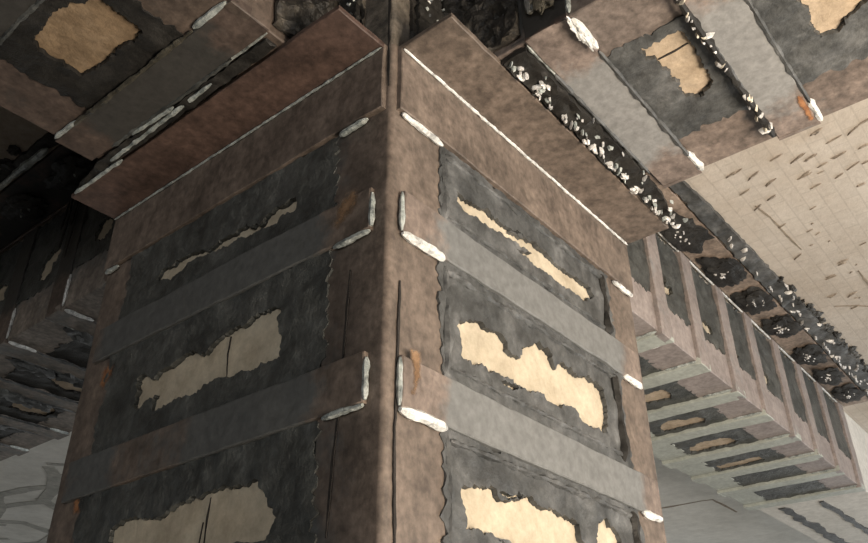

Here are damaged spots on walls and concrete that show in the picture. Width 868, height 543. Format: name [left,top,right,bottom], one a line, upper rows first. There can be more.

peeling [35,0,140,73]
peeling [642,0,728,94]
peeling [801,0,861,33]
peeling [457,198,590,301]
peeling [138,309,282,411]
crack [341,269,351,359]
crack [393,280,401,543]
peeling [457,321,604,431]
crack [0,463,64,543]
peeling [113,481,276,543]
crack [325,417,339,538]
peeling [461,488,577,543]